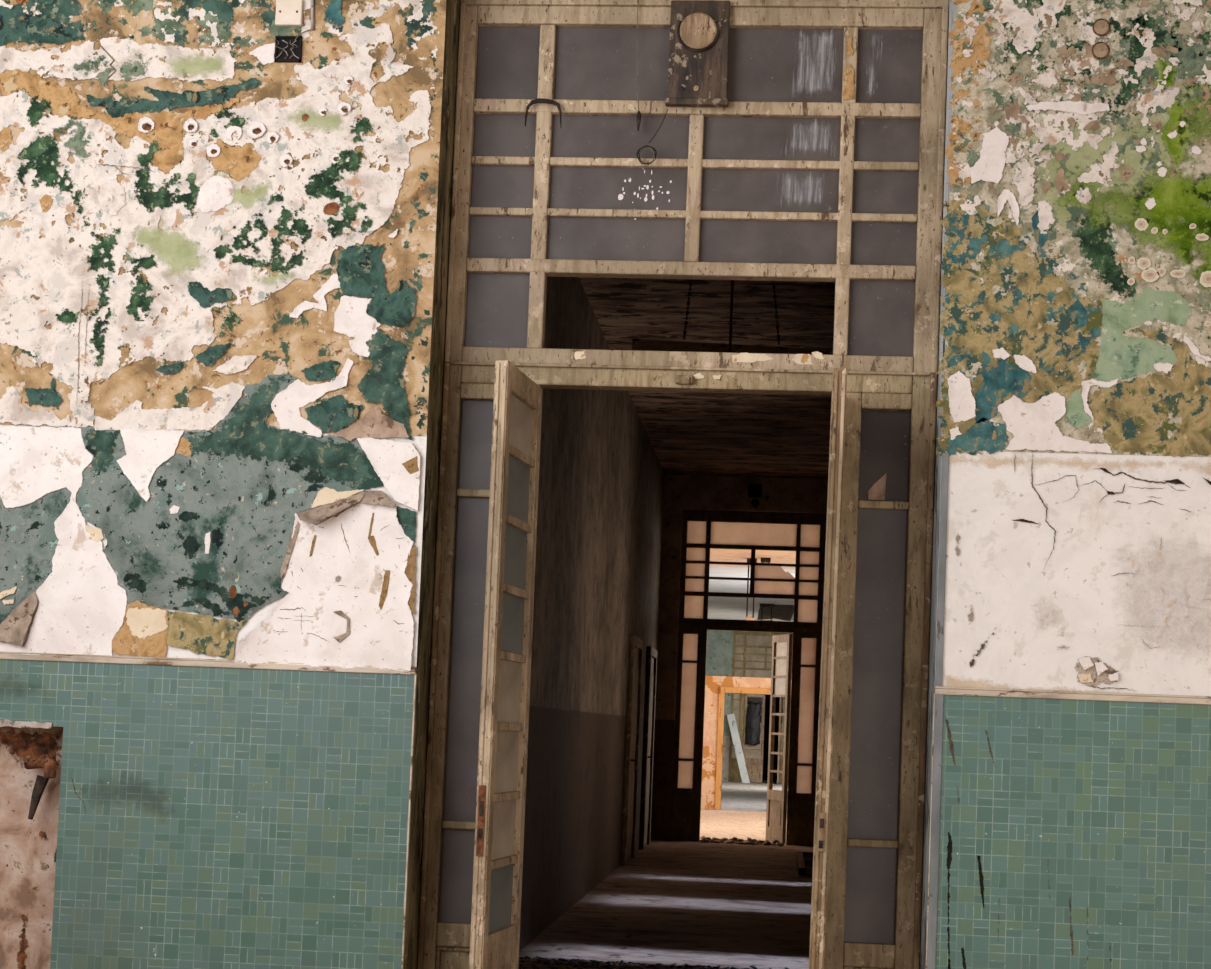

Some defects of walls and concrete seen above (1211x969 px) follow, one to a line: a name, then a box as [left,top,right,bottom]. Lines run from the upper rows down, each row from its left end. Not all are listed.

flaking render [936,0,1211,457]
peeling [0,0,439,671]
crack [1013,453,1211,570]
rust [0,729,62,768]
rust [17,914,29,969]